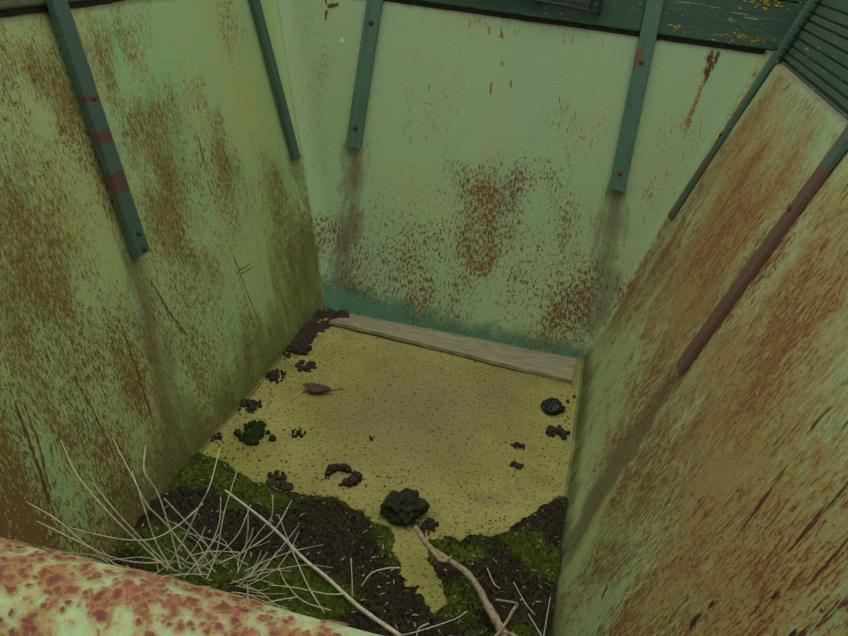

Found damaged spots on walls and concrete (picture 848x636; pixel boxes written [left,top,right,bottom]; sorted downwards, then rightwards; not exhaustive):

corrosion [0,28,79,135]
corrosion [0,130,97,515]
corrosion [74,4,260,331]
corrosion [369,97,618,343]
corrosion [628,50,721,224]
corrosion [559,172,848,636]
corrosion [0,533,349,636]